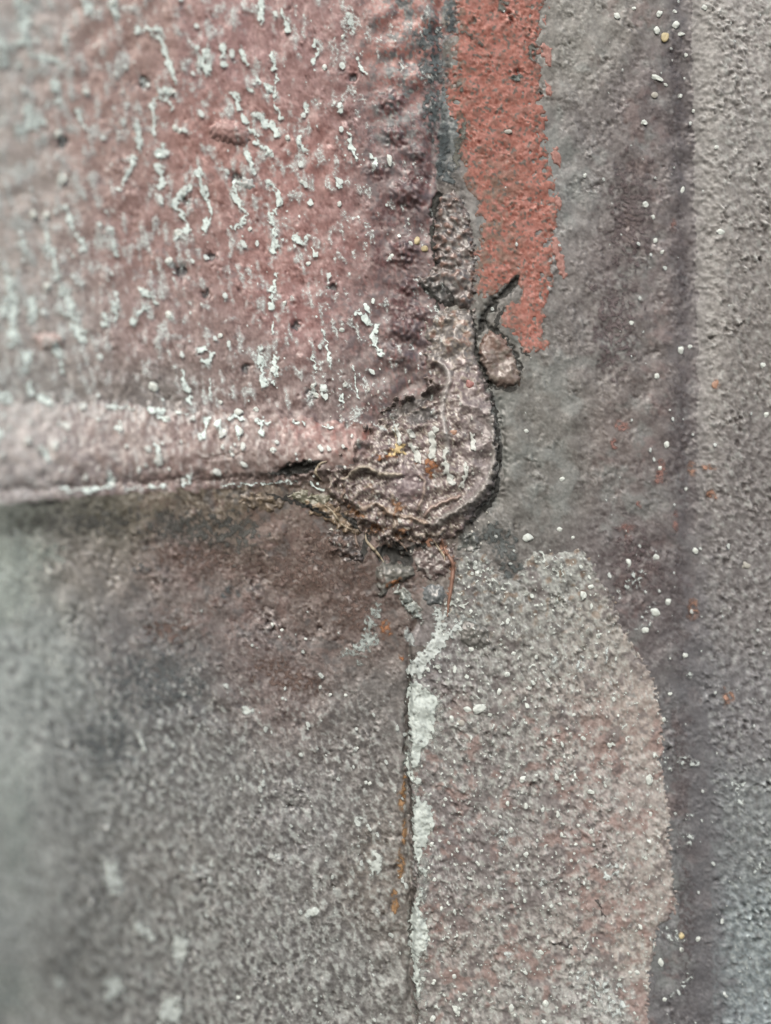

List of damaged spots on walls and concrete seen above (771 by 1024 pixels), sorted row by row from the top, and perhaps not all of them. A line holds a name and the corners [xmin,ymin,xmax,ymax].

leakage [116,24,177,191]
leakage [171,166,213,241]
leakage [194,43,228,74]
leakage [229,51,284,254]
leakage [347,132,378,166]
peeling [445,0,568,389]
leakage [147,369,193,422]
leakage [257,346,279,387]
leakage [354,303,385,357]
rust [391,775,407,914]
crack [402,655,421,1024]
leakage [401,597,476,1014]